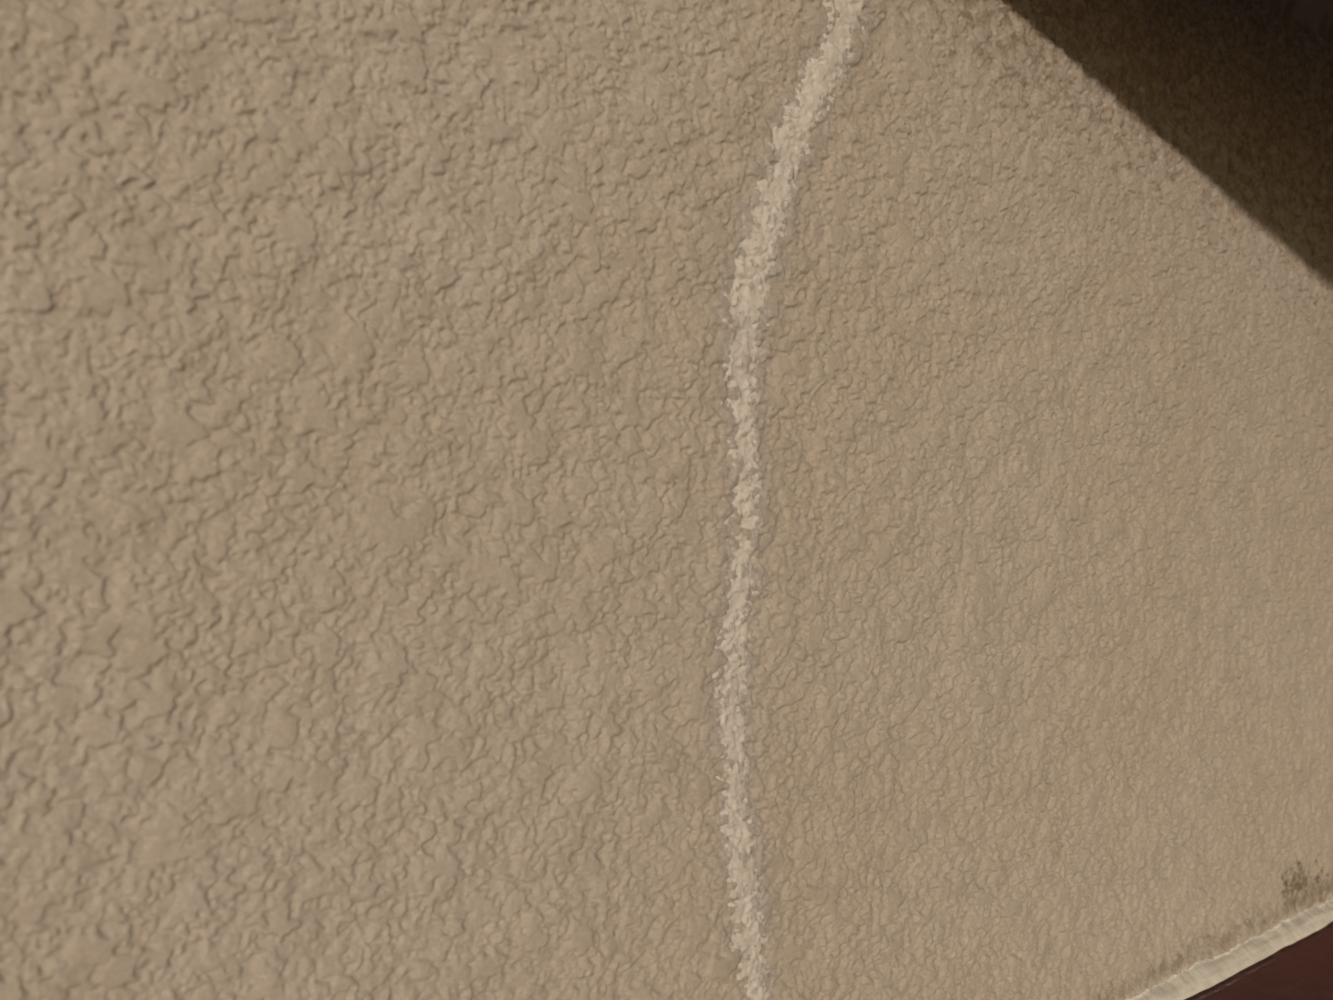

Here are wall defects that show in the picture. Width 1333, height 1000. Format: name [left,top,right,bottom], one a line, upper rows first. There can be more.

crack [710,0,871,1000]